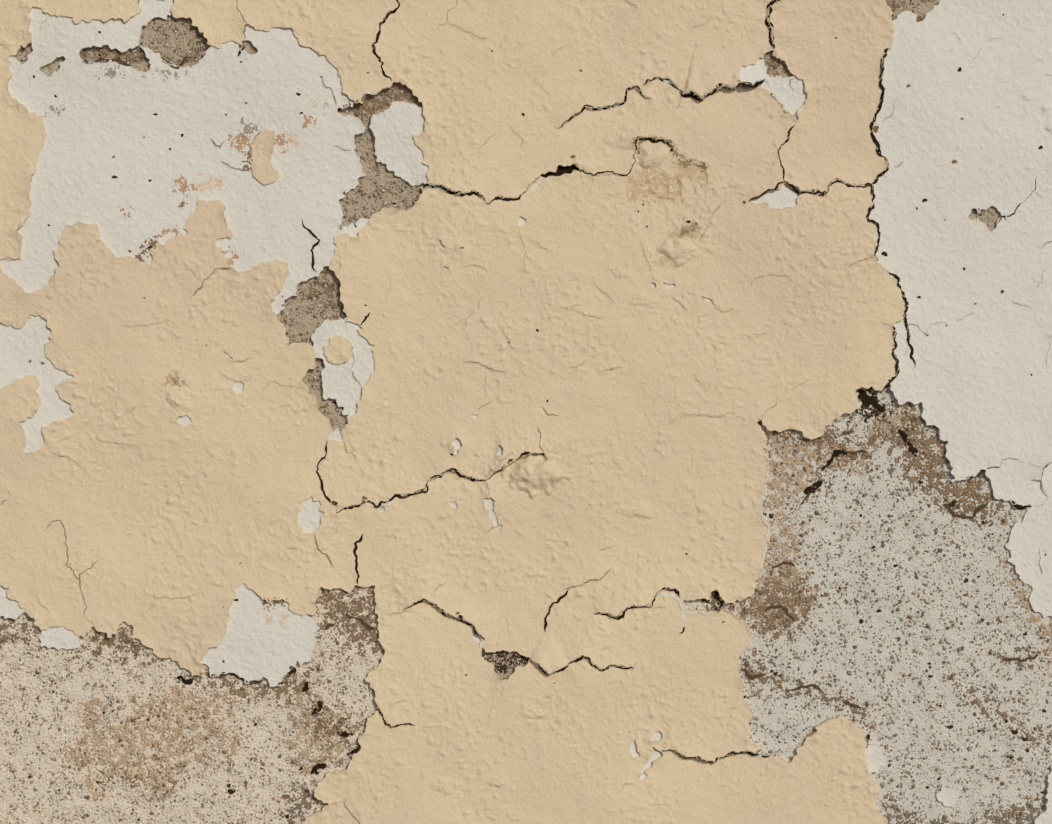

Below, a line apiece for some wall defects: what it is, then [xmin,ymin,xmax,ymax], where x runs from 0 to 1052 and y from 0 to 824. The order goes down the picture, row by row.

crack [765,0,780,51]
crack [420,177,539,204]
peeling [0,0,429,453]
crack [557,48,975,457]
peeling [683,0,1052,824]
crack [800,449,867,505]
peeling [298,497,338,534]
crack [544,546,613,632]
crack [594,587,680,620]
crack [531,655,637,675]
spalling [0,583,385,824]
peeling [629,731,664,780]